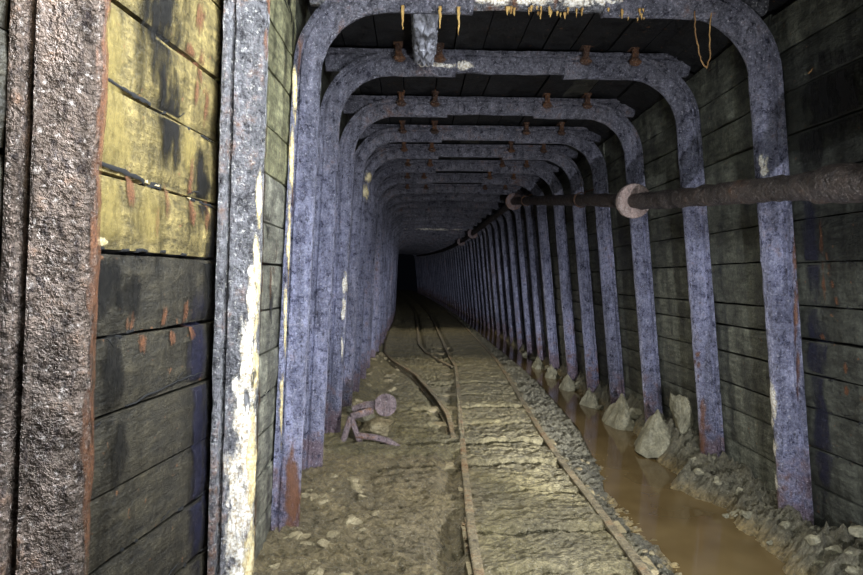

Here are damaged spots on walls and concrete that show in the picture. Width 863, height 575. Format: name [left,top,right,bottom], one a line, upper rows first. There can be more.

damp [104,17,130,162]
damp [98,180,119,246]
damp [134,180,166,236]
damp [142,0,216,551]
corrosion [285,445,301,527]